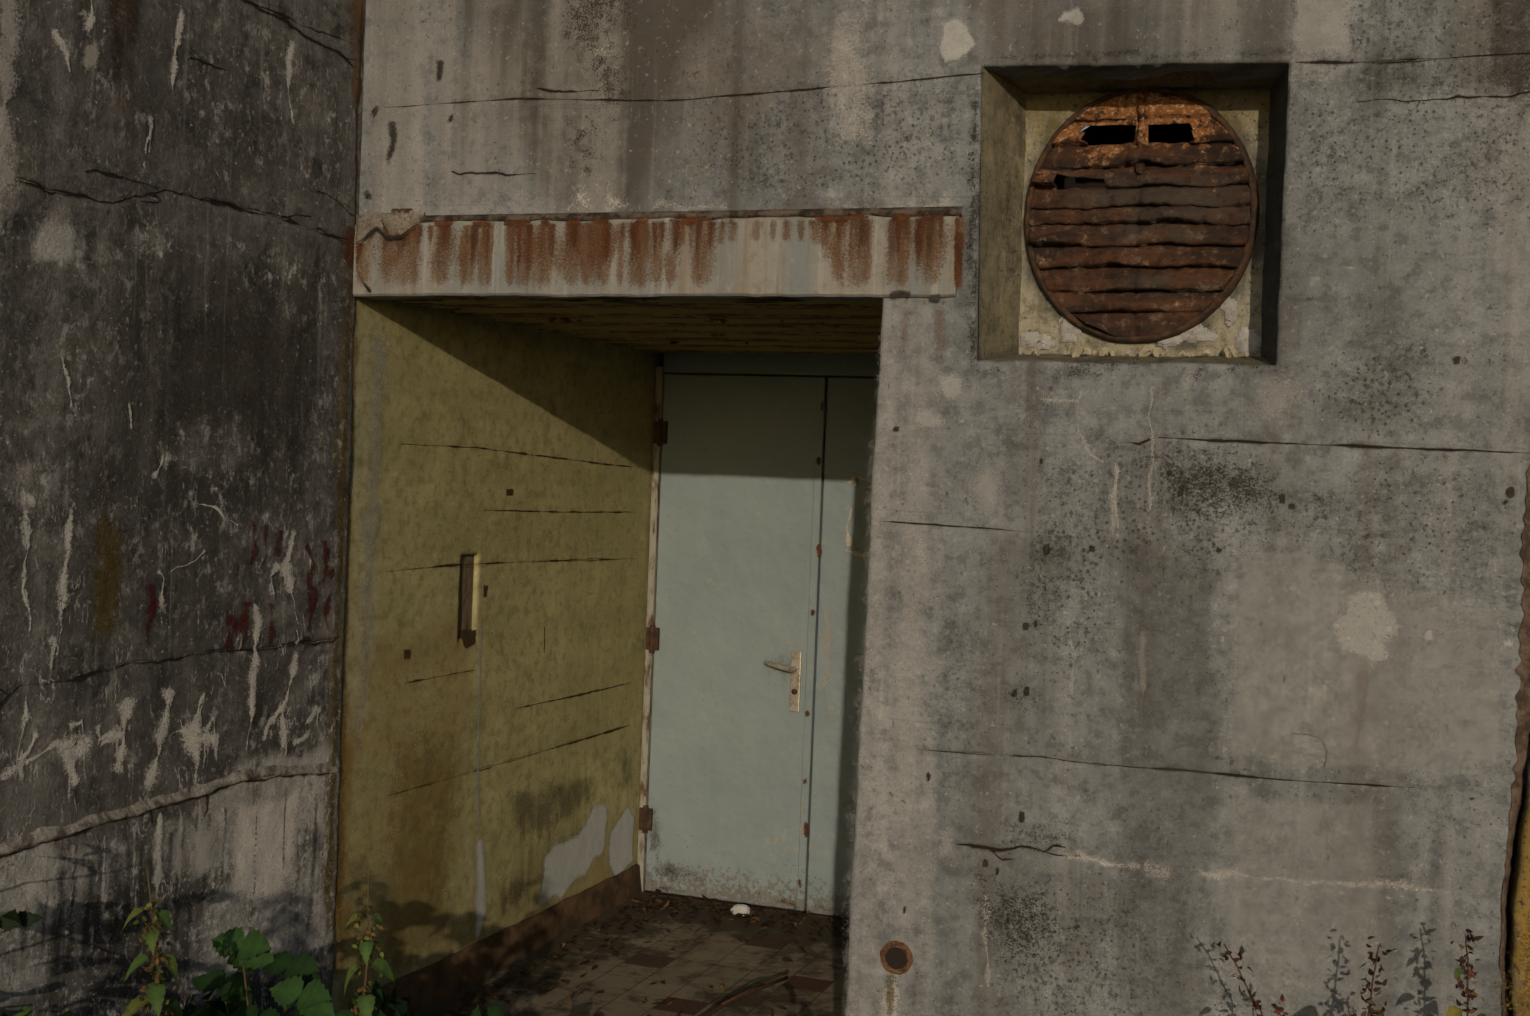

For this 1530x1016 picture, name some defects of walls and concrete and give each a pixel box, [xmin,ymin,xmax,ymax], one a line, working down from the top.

crack [14,0,981,244]
crack [1298,53,1530,64]
crack [1357,91,1530,102]
corrosion [402,216,737,303]
corrosion [783,213,965,298]
damp [0,280,356,963]
crack [0,638,335,708]
crack [922,733,1417,788]
crack [0,773,329,858]
peeling [539,804,634,906]
crack [957,844,1076,860]